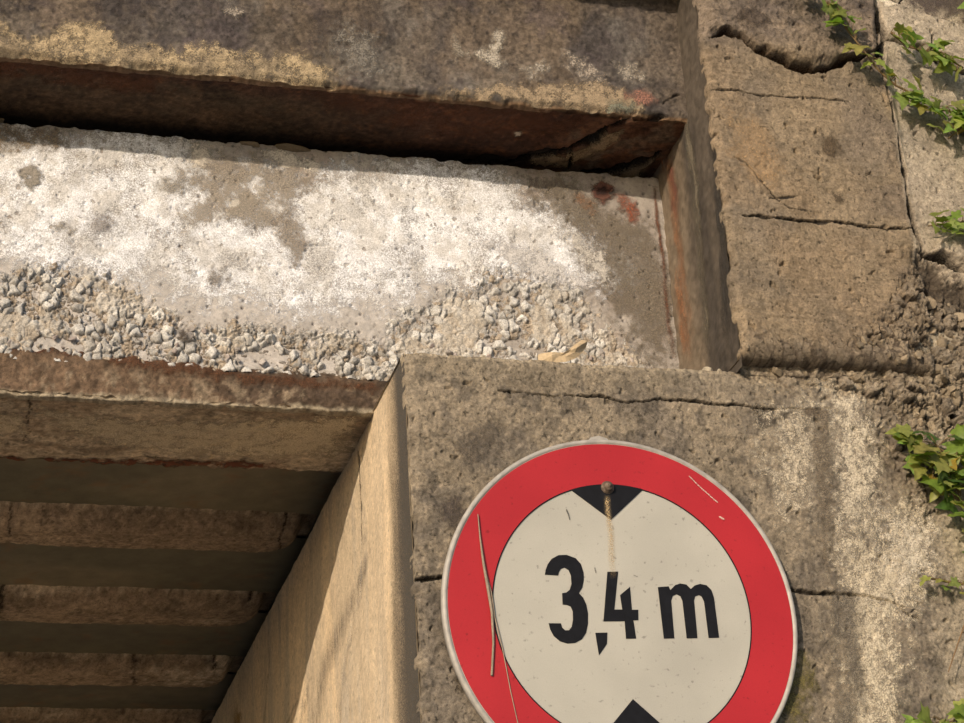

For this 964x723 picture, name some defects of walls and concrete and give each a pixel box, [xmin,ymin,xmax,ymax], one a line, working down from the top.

damp [309,10,384,80]
damp [453,31,504,68]
damp [567,51,600,80]
crack [711,0,902,102]
crack [465,94,680,174]
rust [577,180,639,222]
damp [0,124,679,368]
rust [108,355,377,393]
crack [498,391,796,411]